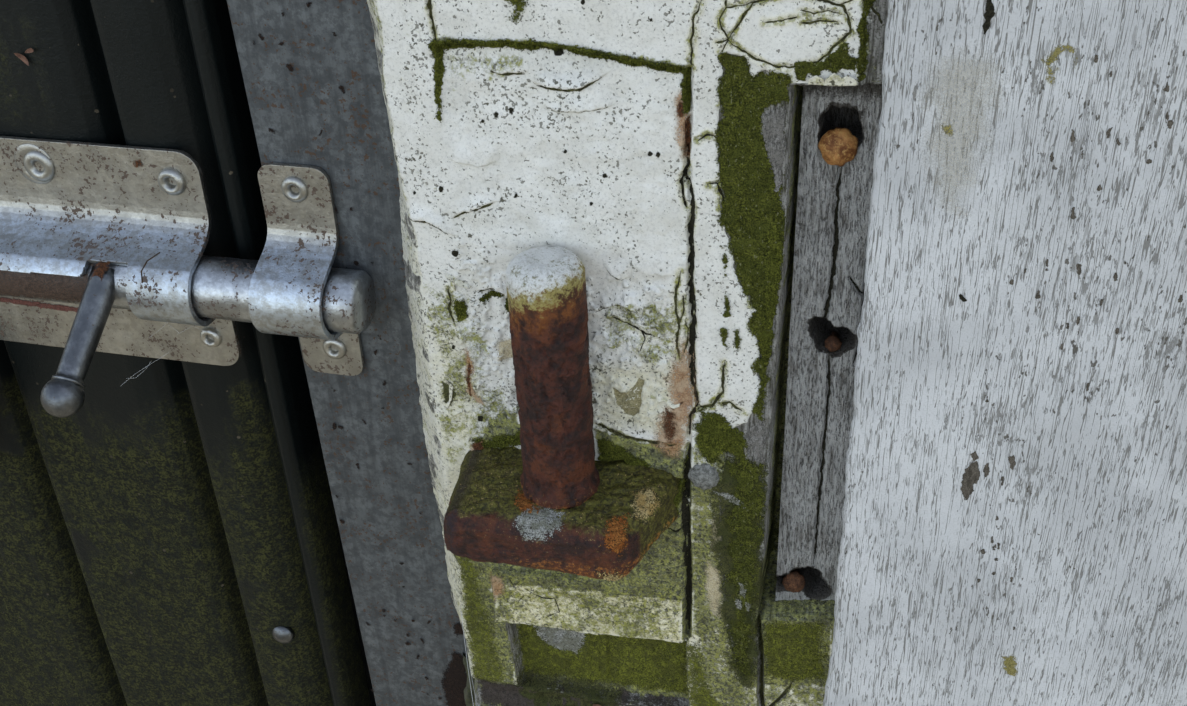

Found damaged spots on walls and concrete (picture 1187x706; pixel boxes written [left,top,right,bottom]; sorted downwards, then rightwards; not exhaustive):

crack [689,0,853,68]
corrosion [676,93,691,158]
peeling [436,379,463,416]
corrosion [466,351,483,404]
spalling [613,378,680,416]
crack [595,134,742,630]
corrosion [654,344,695,457]
corrosion [600,489,660,556]